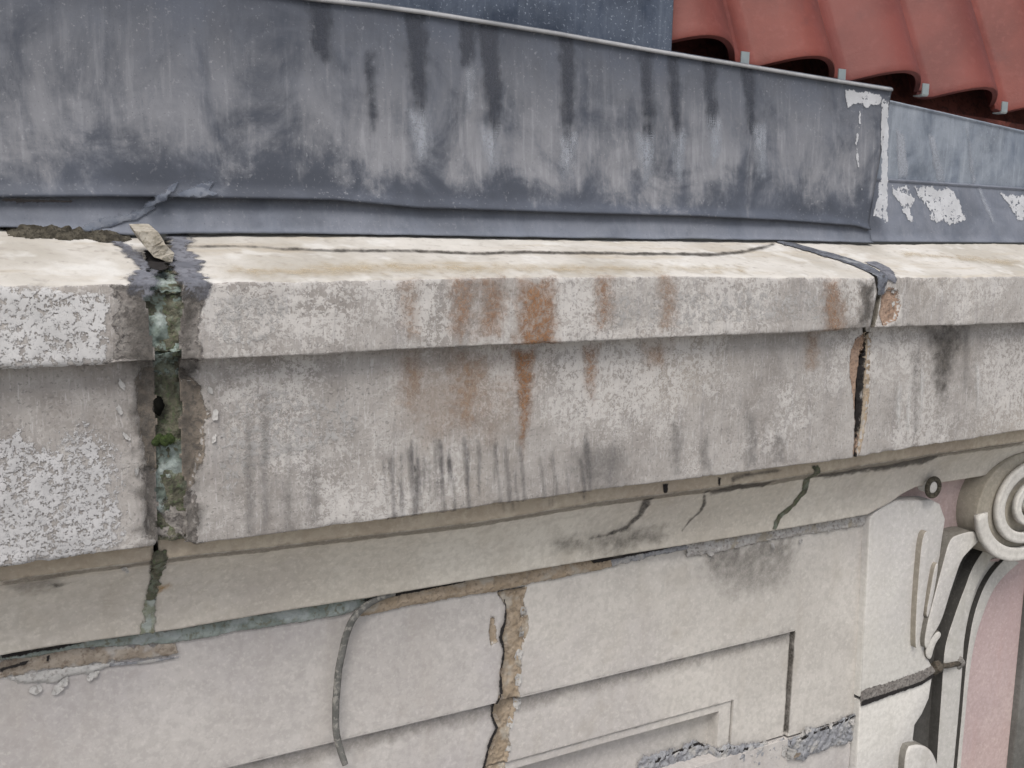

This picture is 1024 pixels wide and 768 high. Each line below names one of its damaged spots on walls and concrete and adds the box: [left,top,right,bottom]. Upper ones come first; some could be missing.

leakage [406,13,427,156]
leakage [460,23,500,157]
leakage [669,57,683,167]
leakage [742,67,765,161]
peeling [845,89,966,226]
peeling [1000,193,1024,220]
rust [516,282,554,437]
crack [850,332,872,457]
crack [687,470,778,525]
crack [772,465,820,530]
crack [140,549,168,635]
peeling [3,660,114,695]